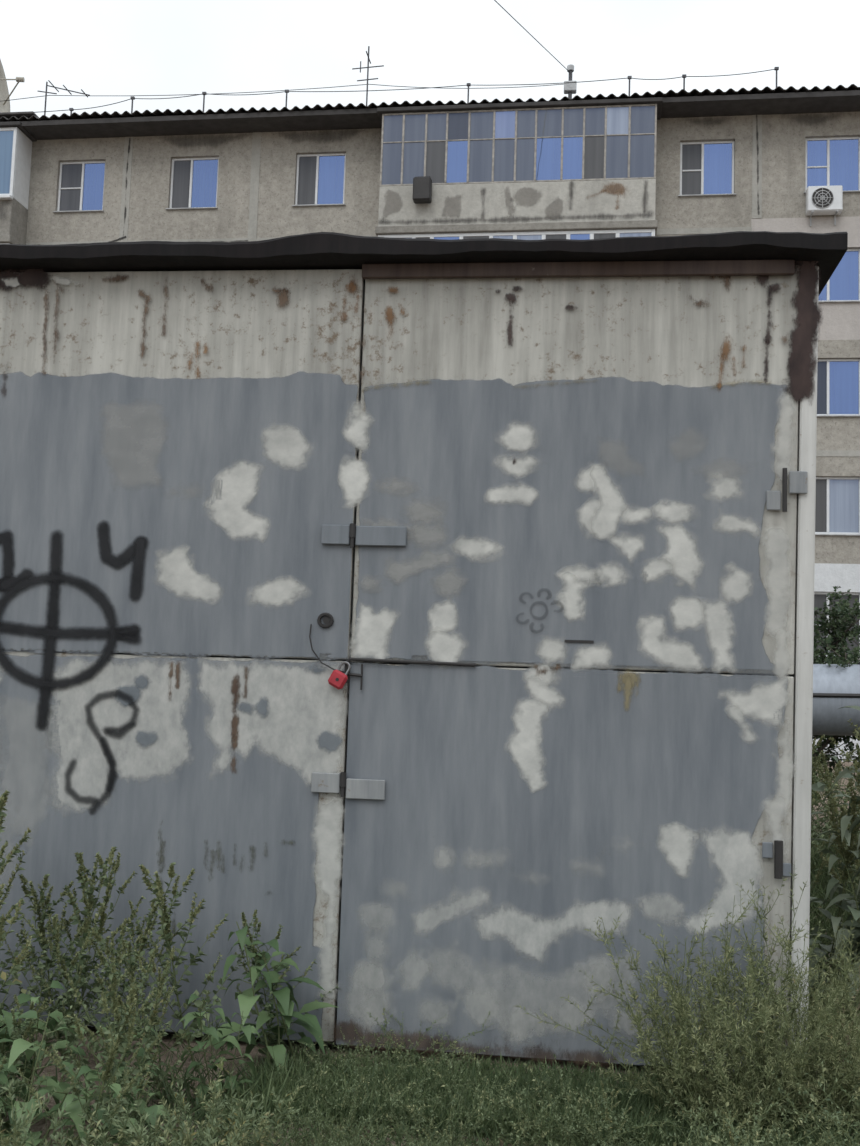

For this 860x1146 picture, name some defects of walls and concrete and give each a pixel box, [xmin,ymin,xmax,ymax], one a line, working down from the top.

rust [42,287,62,373]
rust [138,290,151,358]
rust [273,288,289,307]
rust [341,280,365,320]
rust [385,307,404,333]
rust [496,286,522,346]
rust [188,342,208,378]